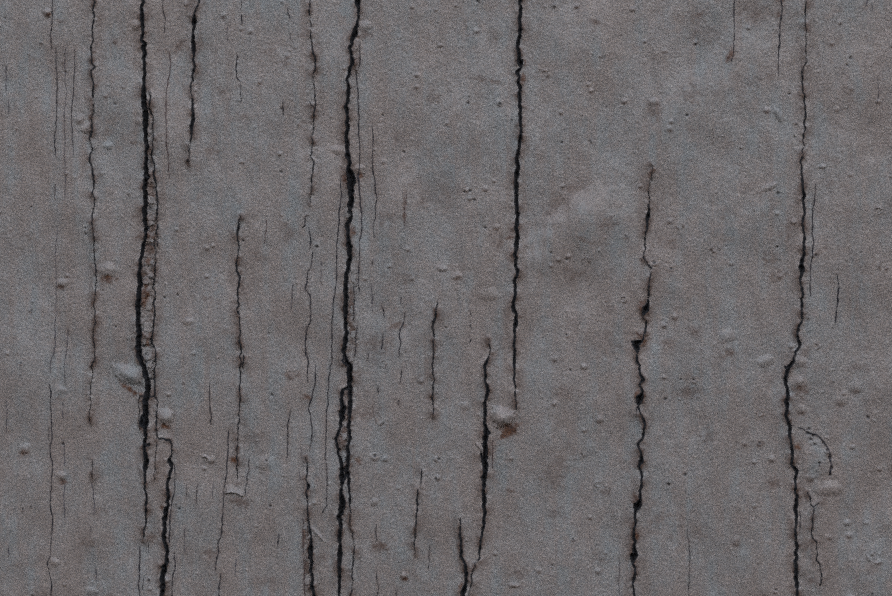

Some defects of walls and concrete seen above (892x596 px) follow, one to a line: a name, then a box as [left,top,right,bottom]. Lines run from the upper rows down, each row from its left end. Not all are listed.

crack [135,0,249,596]
crack [286,0,406,596]
crack [459,308,493,596]
crack [511,0,524,411]
crack [619,164,653,596]
crack [776,0,784,76]
crack [783,1,832,596]